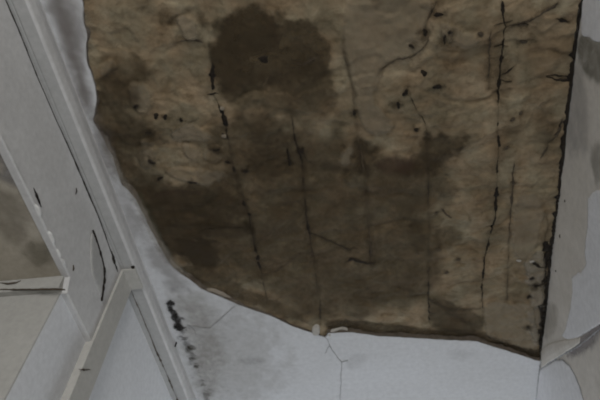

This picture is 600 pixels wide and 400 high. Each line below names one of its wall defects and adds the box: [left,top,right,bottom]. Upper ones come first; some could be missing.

crack [177,40,267,299]
leakage [210,4,331,96]
leakage [97,78,540,357]
crack [286,110,375,319]
spalling [82,0,600,361]
crack [480,0,600,395]